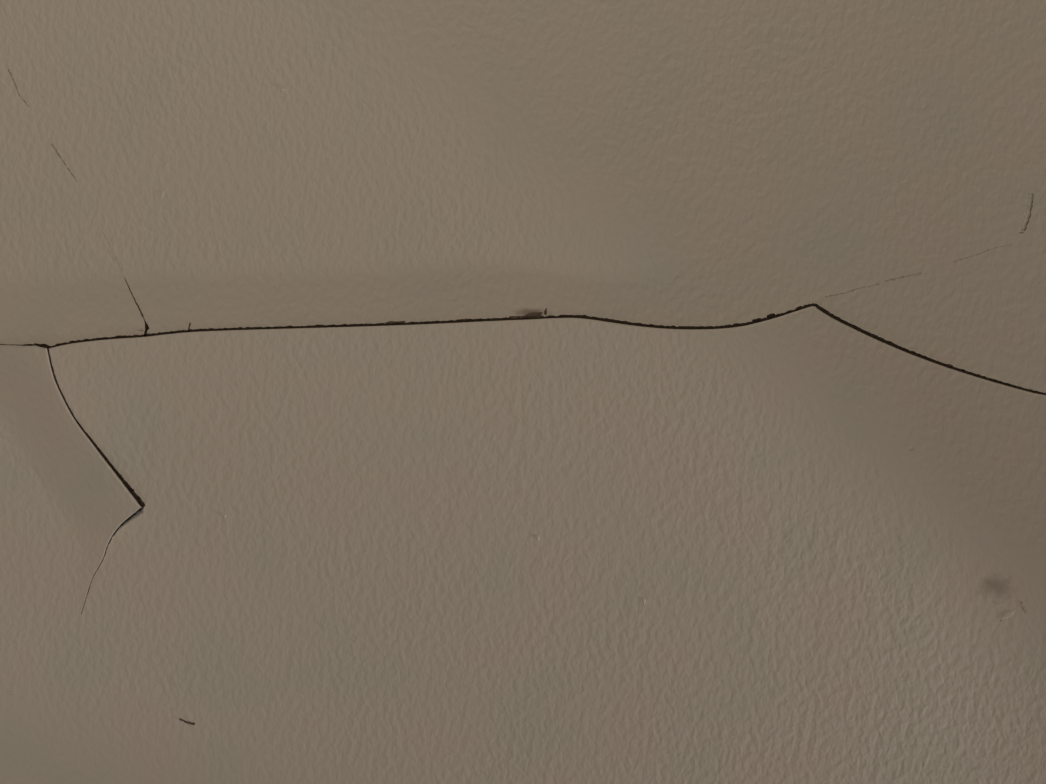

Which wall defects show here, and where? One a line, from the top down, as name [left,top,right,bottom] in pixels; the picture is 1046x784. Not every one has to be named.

crack [0,232,1046,614]